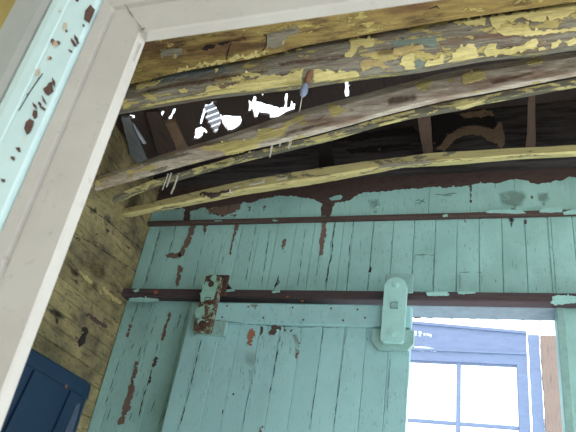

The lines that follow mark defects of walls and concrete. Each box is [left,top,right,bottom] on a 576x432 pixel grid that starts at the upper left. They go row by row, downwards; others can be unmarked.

peeling [24,77,55,134]
peeling [82,5,95,27]
peeling [135,26,299,90]
peeling [145,68,304,107]
peeling [313,59,391,83]
peeling [345,36,374,58]
peeling [461,70,486,84]
peeling [392,2,576,70]
peeling [199,114,305,157]
peeling [126,152,576,258]
peeling [247,325,293,346]
peeling [117,361,139,425]